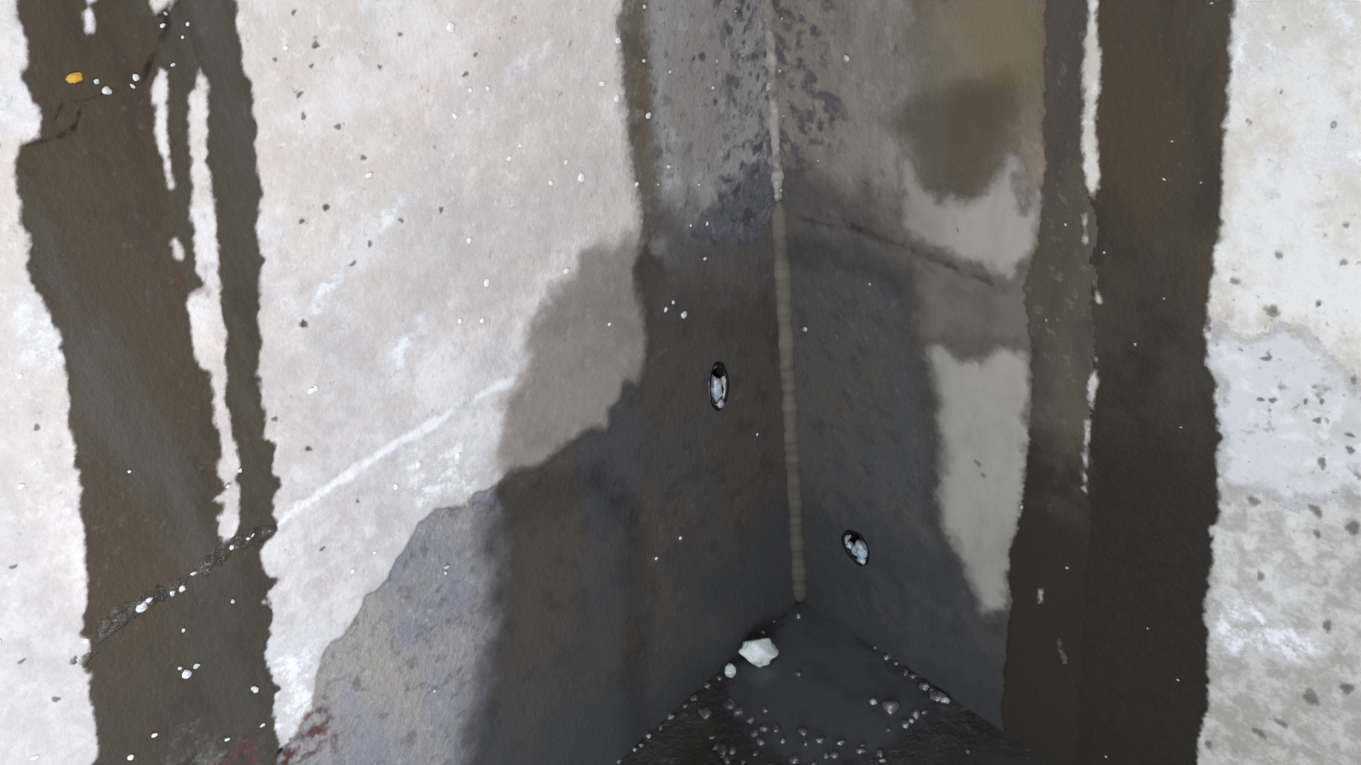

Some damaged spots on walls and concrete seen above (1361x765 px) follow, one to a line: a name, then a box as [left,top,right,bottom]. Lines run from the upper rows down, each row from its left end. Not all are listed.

water stain [13,0,797,765]
water stain [761,0,1252,765]
water stain [1210,598,1322,663]